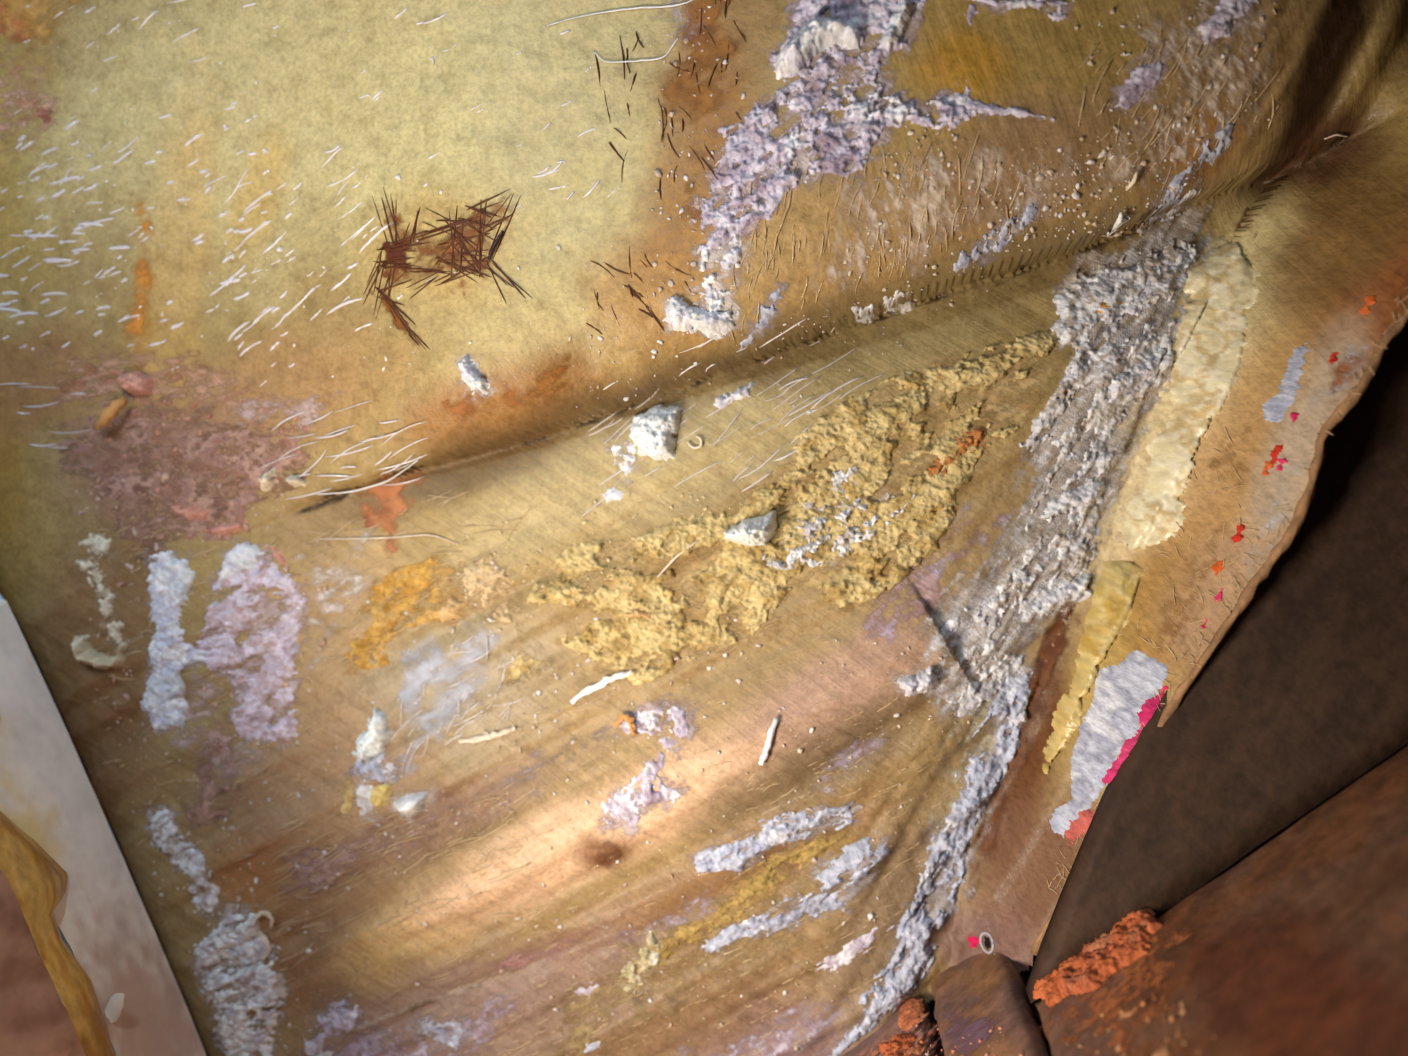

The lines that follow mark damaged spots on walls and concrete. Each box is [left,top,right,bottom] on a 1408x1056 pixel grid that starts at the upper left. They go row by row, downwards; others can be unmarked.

corrosion [363,188,532,350]
damp [691,226,750,335]
damp [1125,385,1151,456]
damp [1008,605,1072,770]
damp [975,808,1001,872]